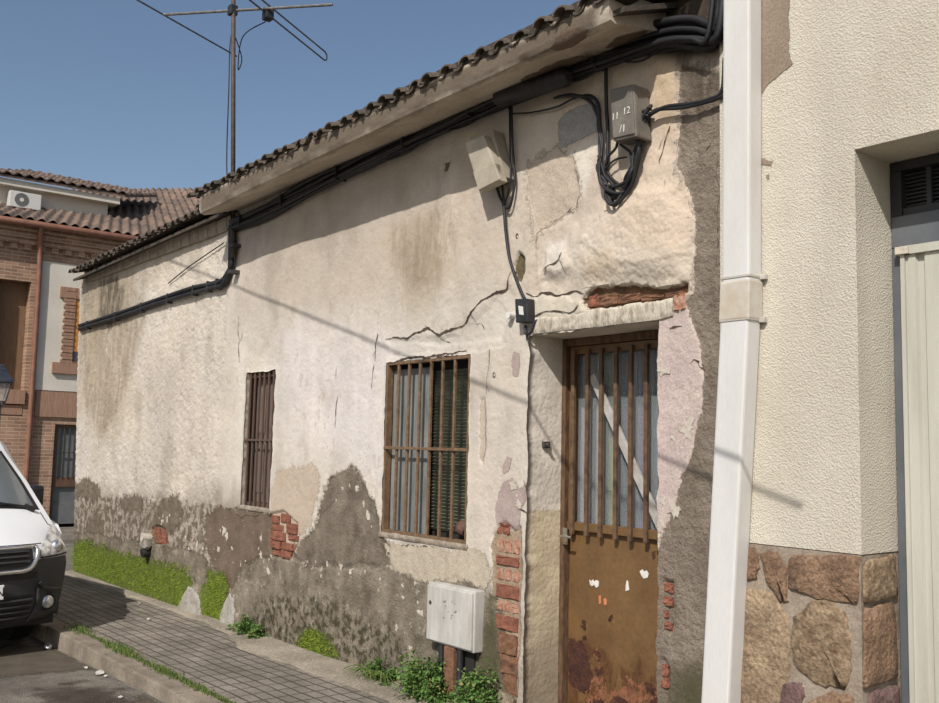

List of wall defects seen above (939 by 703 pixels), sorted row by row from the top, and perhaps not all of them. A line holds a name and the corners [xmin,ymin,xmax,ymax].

crack [371,253,588,395]
peeling [583,57,720,703]
leakage [74,477,212,555]
peeling [74,457,527,701]
corrosion [568,619,658,703]